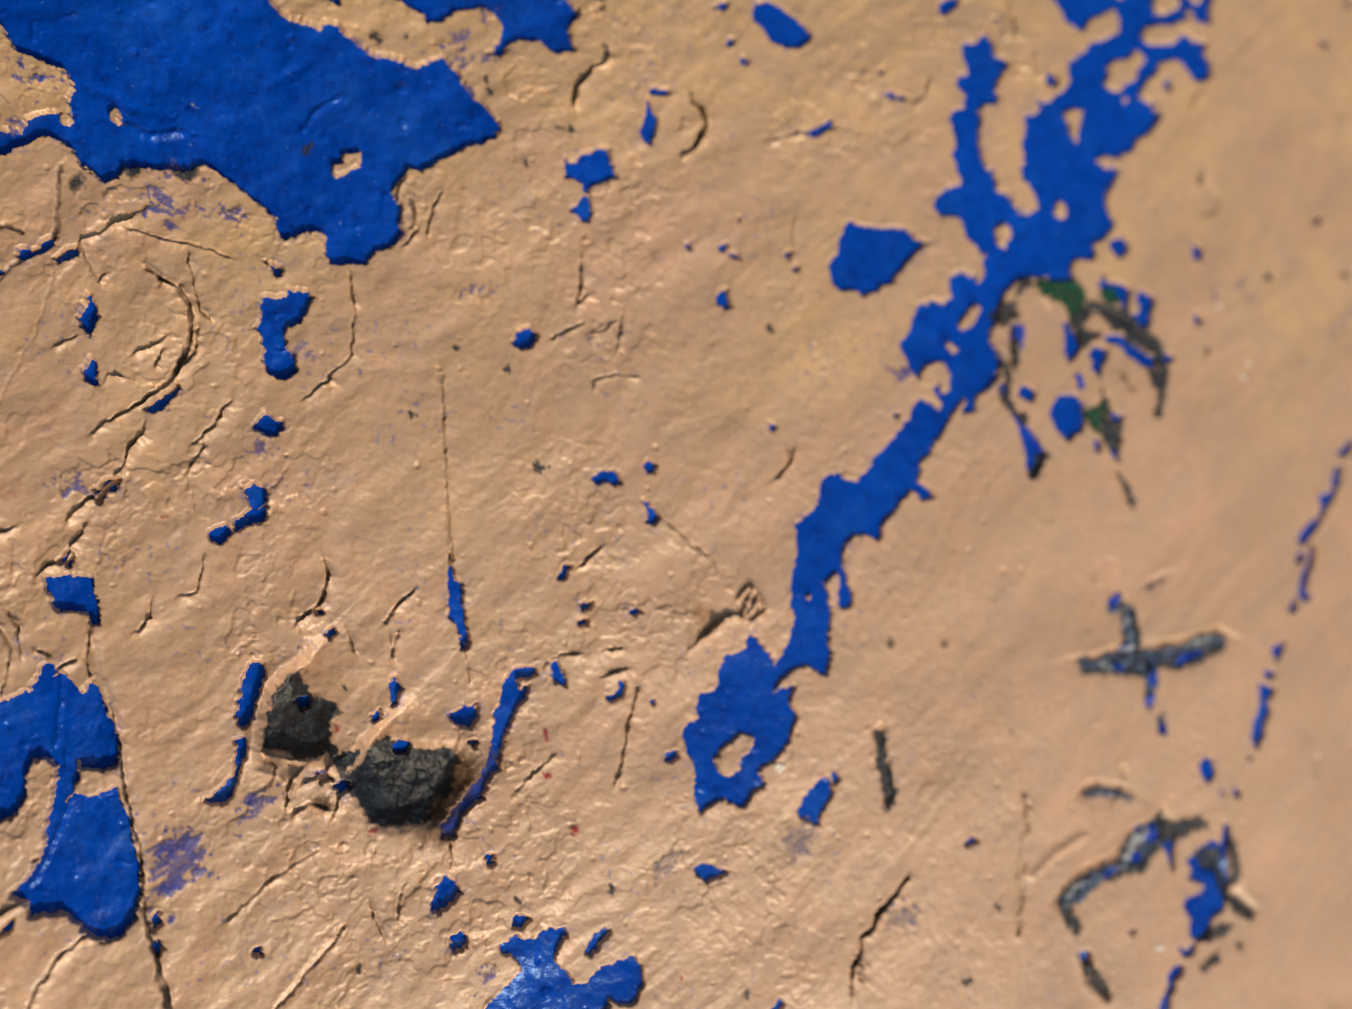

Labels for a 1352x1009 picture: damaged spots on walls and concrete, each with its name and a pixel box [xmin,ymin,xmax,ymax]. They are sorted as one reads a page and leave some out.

peeling [400,0,578,58]
peeling [0,0,500,265]
crack [117,259,201,417]
peeling [257,266,313,380]
peeling [664,0,1226,812]
peeling [45,550,101,625]
peeling [0,663,162,955]
crack [112,712,172,1009]
peeling [485,915,643,1009]
peeling [797,771,838,825]
crack [850,876,908,979]
peeling [1058,813,1254,1009]